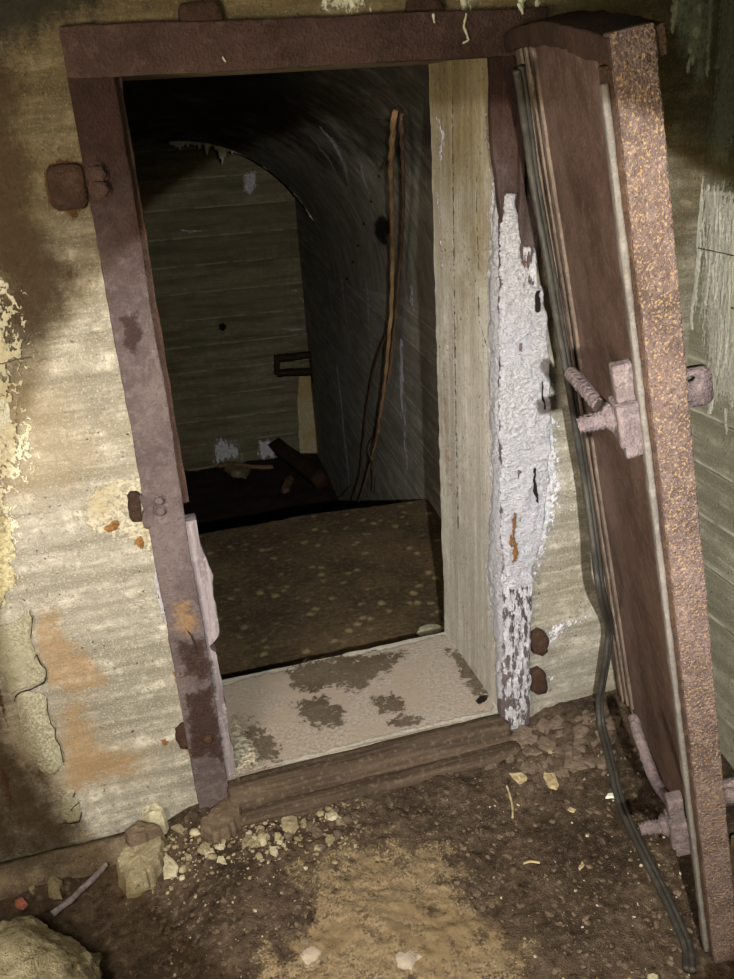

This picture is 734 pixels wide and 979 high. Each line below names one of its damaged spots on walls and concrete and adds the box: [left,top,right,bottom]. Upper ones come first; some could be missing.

leakage [321,0,372,12]
leakage [670,0,734,163]
leakage [0,68,73,606]
corrosion [119,312,141,354]
leakage [690,176,734,435]
leakage [213,437,242,465]
leakage [257,439,274,460]
crack [14,611,64,763]
corrosion [177,640,224,763]
leakage [285,650,425,731]
leakage [233,716,282,770]
crack [63,793,82,824]